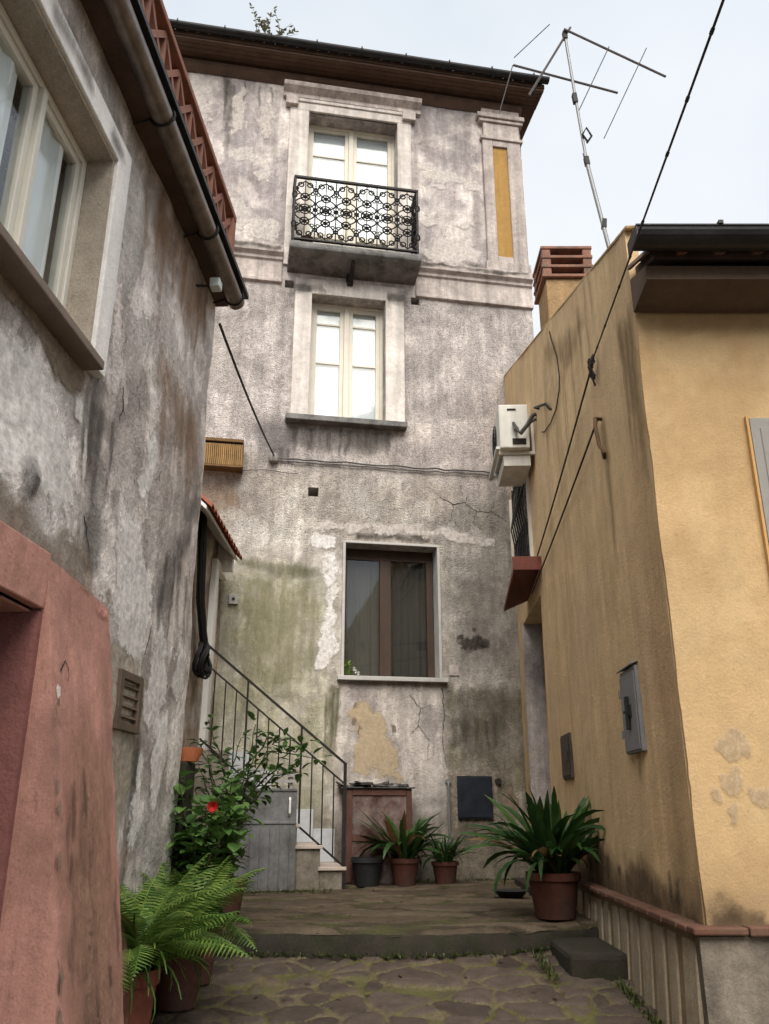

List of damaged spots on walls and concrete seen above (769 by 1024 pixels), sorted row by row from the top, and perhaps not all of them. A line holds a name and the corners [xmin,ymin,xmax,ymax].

crack [440,493,506,533]
flaking render [310,533,340,670]
flaking render [347,701,403,782]
crack [410,688,450,760]